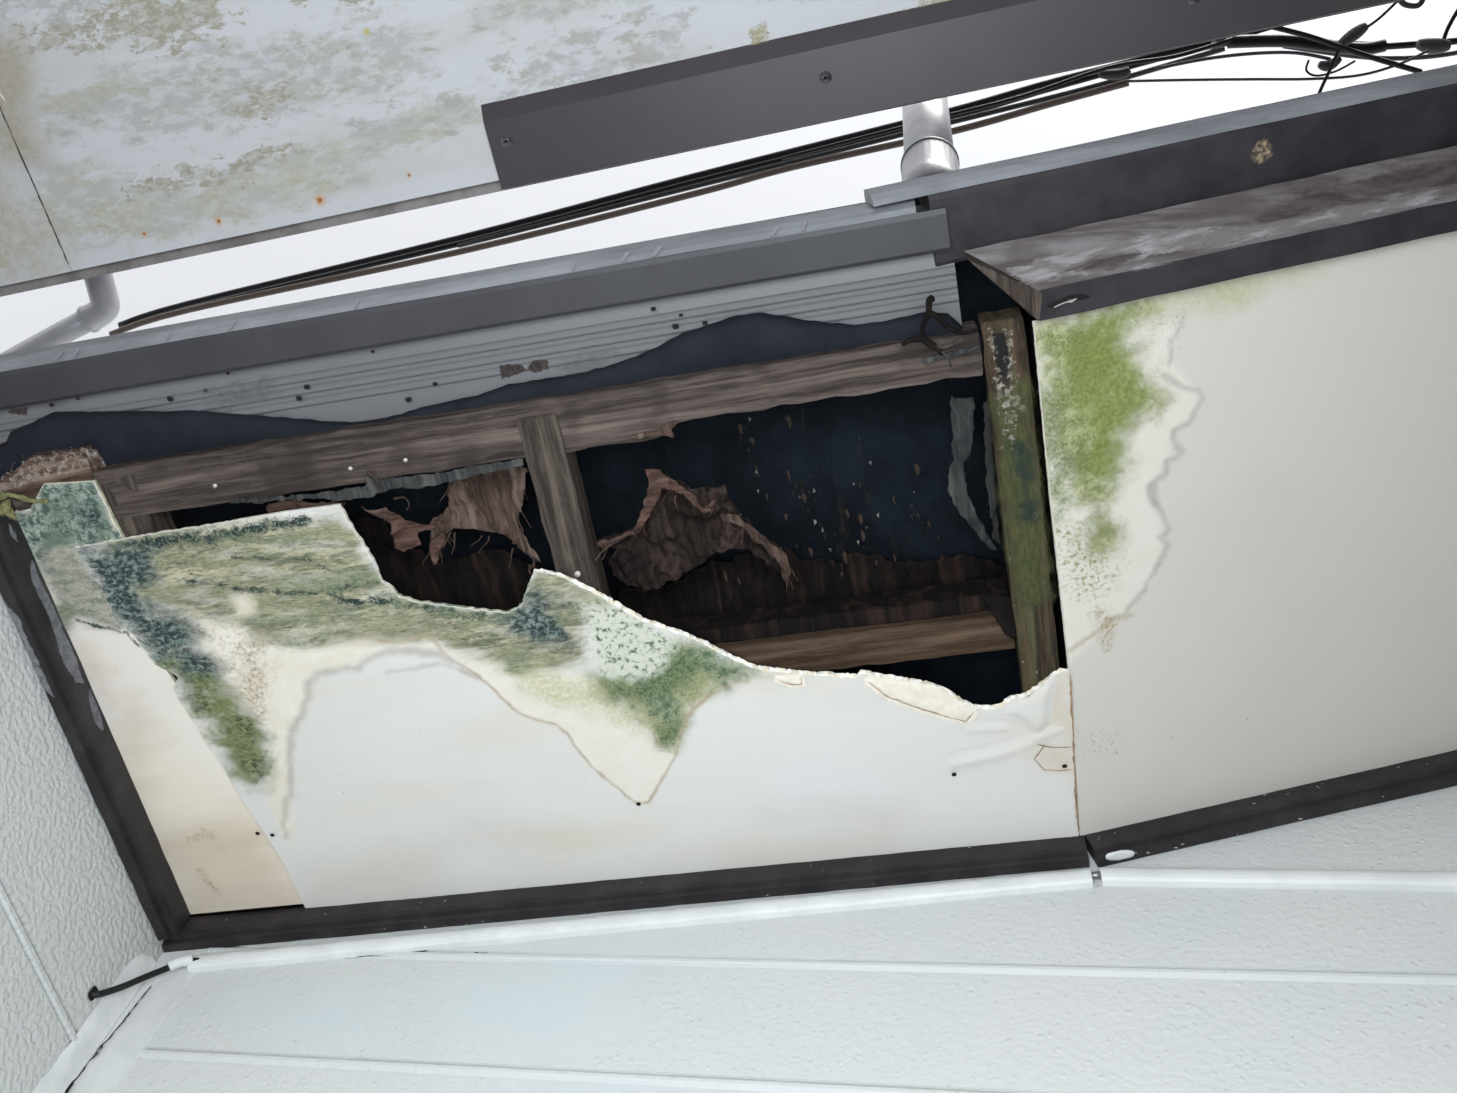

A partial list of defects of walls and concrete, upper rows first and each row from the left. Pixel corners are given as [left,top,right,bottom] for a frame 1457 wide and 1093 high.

leakage [0,0,712,285]
leakage [747,22,773,45]
peeling [499,359,549,380]
spalling [987,328,1020,449]
leakage [1023,259,1344,779]
leakage [15,481,775,915]